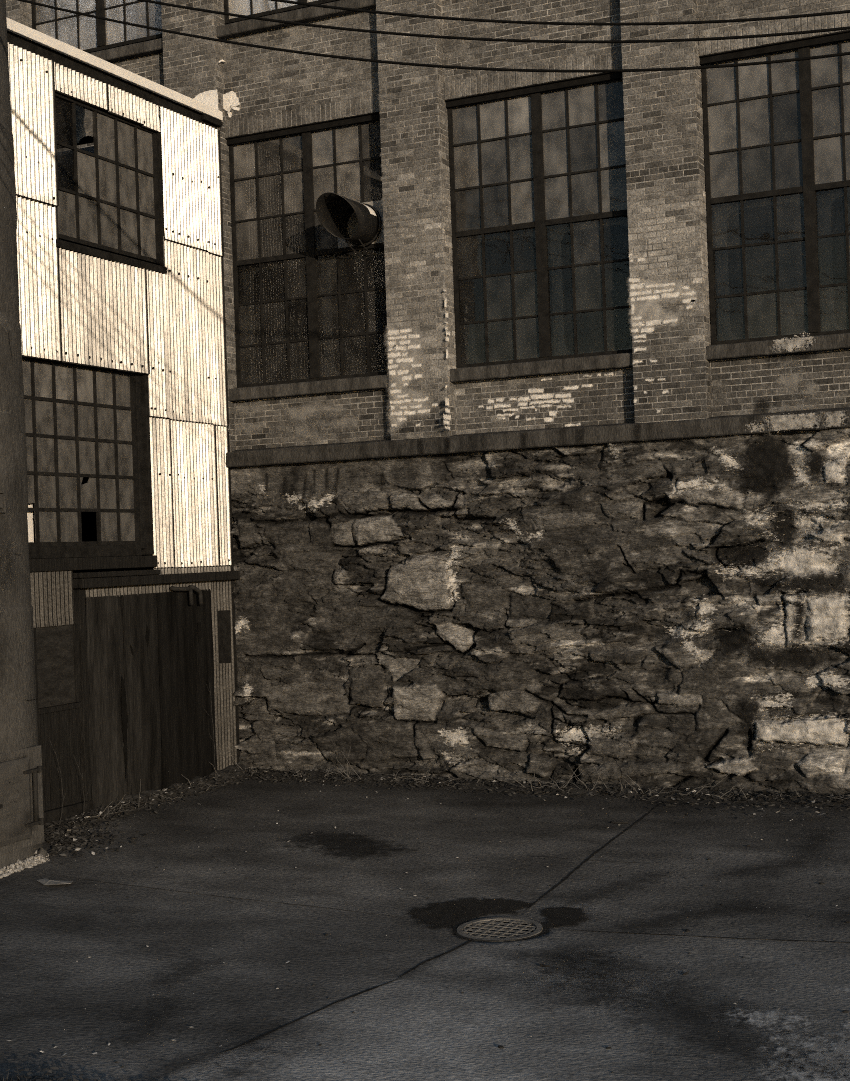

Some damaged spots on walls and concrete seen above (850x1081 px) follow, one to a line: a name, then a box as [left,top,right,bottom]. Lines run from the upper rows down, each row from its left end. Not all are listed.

peeling [629,277,698,364]
peeling [386,327,451,432]
peeling [479,372,613,427]